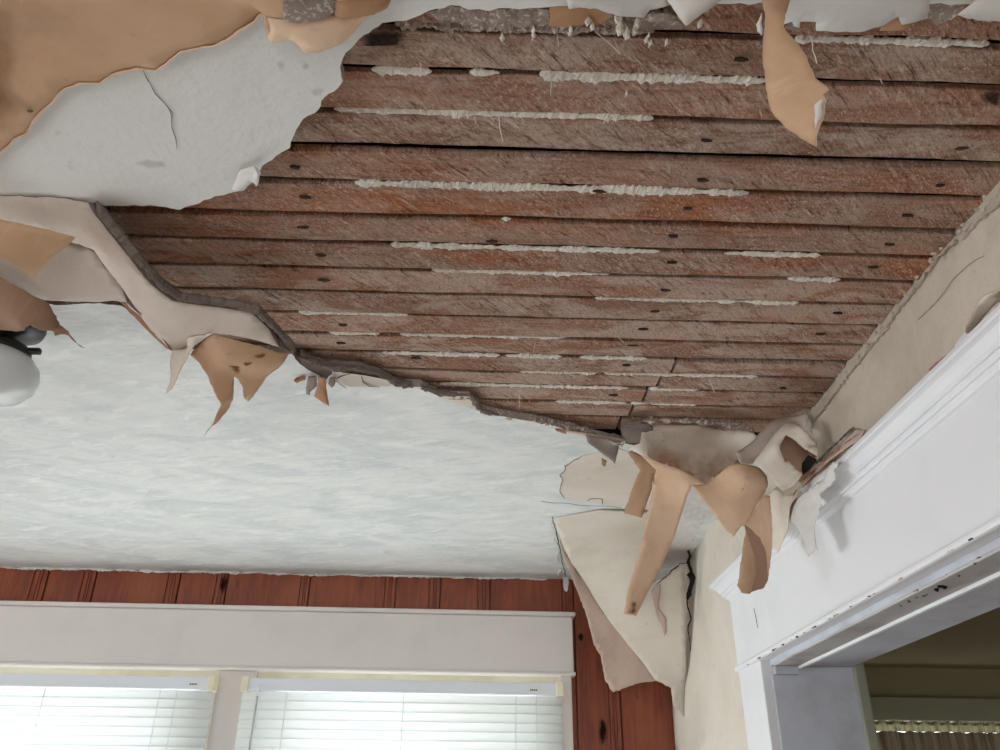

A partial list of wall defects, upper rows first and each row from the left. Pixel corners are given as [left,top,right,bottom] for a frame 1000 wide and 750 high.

spalling [428,5,550,42]
spalling [585,8,703,48]
spalling [928,3,966,26]
crack [143,71,177,148]
flaking render [814,100,823,128]
peeling [232,166,261,191]
spalling [96,201,755,443]
spalling [808,181,1000,428]
peeling [551,521,569,592]
crack [657,549,695,652]